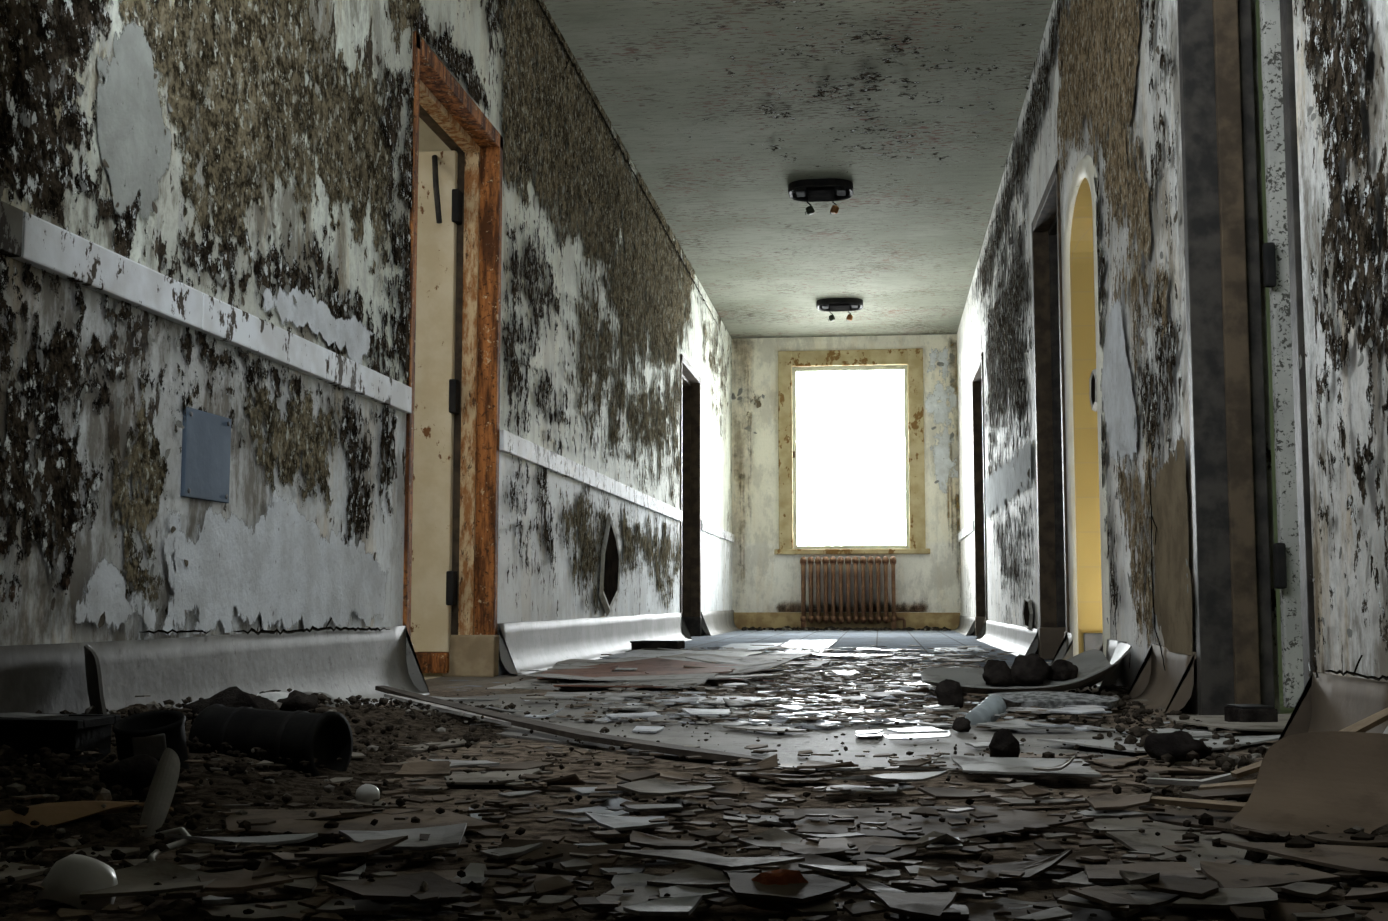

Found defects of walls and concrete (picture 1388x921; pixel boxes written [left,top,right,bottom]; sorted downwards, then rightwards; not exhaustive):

peeling [0,0,765,640]